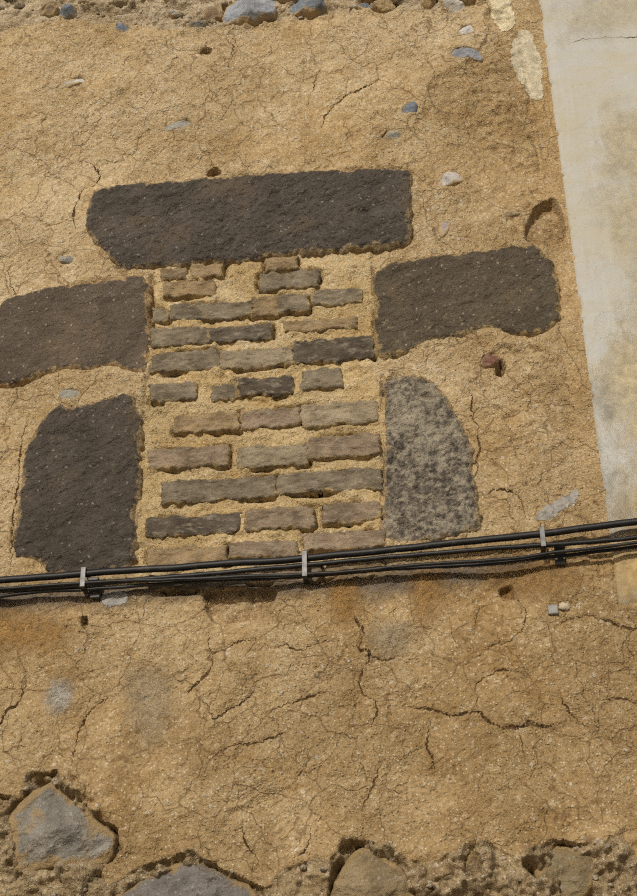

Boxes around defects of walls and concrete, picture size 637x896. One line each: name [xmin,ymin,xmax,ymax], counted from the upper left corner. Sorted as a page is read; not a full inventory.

crack [6,418,29,571]
crack [0,674,27,725]
crack [70,676,108,766]
crack [216,729,290,755]
crack [188,631,333,720]
crack [271,612,588,809]
crack [487,600,527,647]
crack [560,614,637,655]
crack [242,820,259,866]
spalling [0,769,637,896]